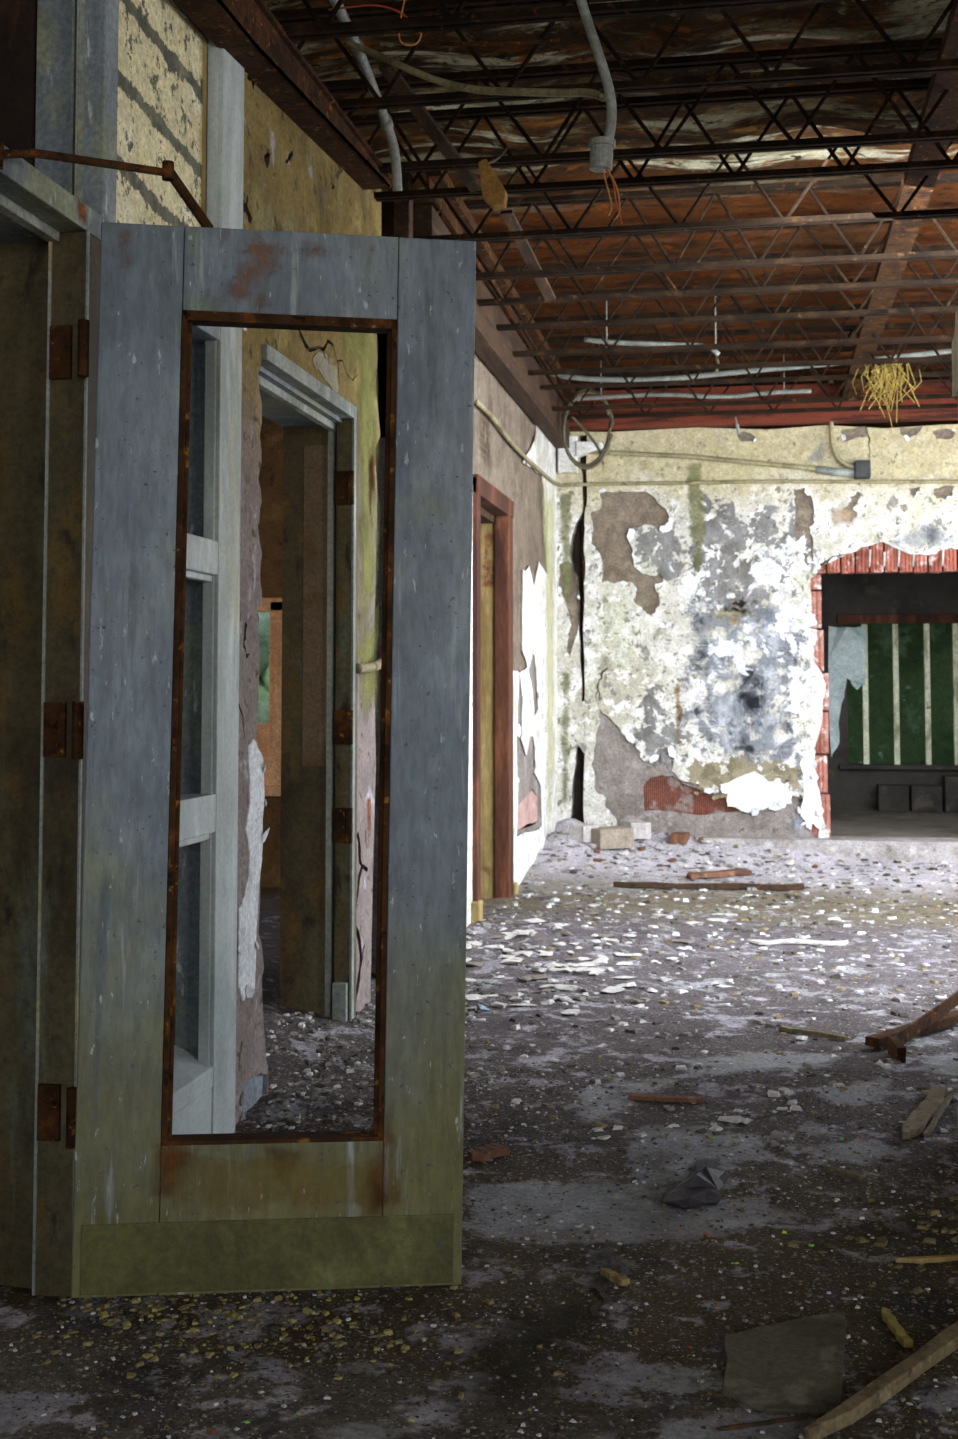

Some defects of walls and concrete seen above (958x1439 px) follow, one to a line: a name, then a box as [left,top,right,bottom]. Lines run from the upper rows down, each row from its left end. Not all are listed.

spalling [473,352,580,836]
peeling [590,488,818,720]
leakage [677,464,810,791]
peeling [237,739,270,1001]
spalling [591,684,824,838]